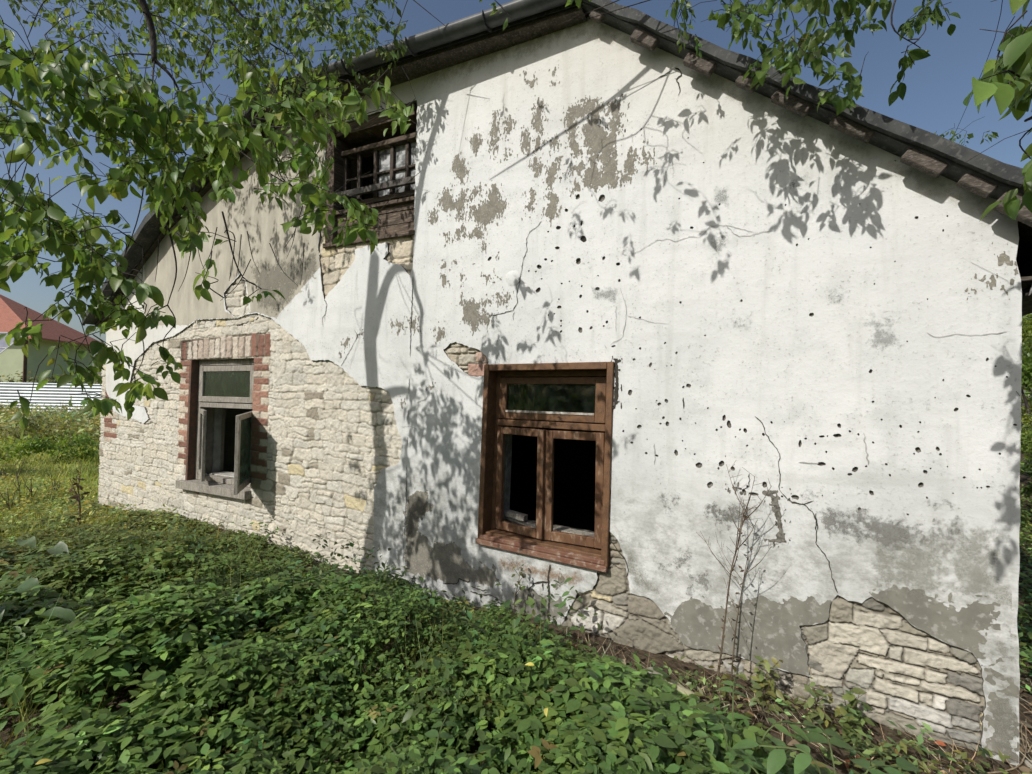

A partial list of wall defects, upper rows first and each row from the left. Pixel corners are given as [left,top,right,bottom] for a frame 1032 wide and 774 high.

flaking render [98,125,414,575]
crack [492,223,540,320]
peeling [390,70,657,377]
crack [632,225,773,254]
flaking render [401,490,1019,763]
leakage [707,505,748,527]
crack [756,417,838,593]
leakage [823,508,994,593]